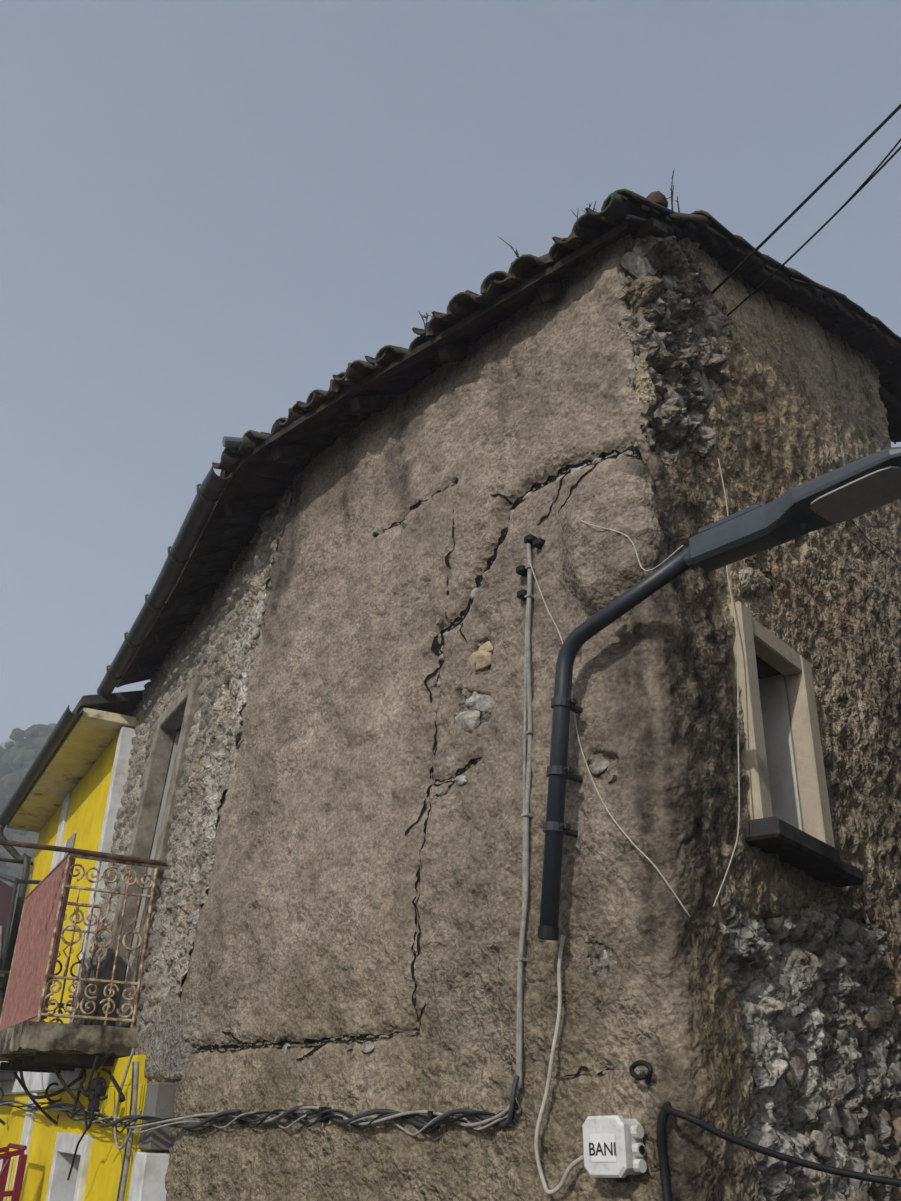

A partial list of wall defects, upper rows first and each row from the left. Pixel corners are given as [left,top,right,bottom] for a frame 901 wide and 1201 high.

flaking render [616,233,734,471]
flaking render [139,490,294,1023]
crack [193,441,645,1060]
crack [563,1066,614,1079]
flaking render [715,886,901,1201]